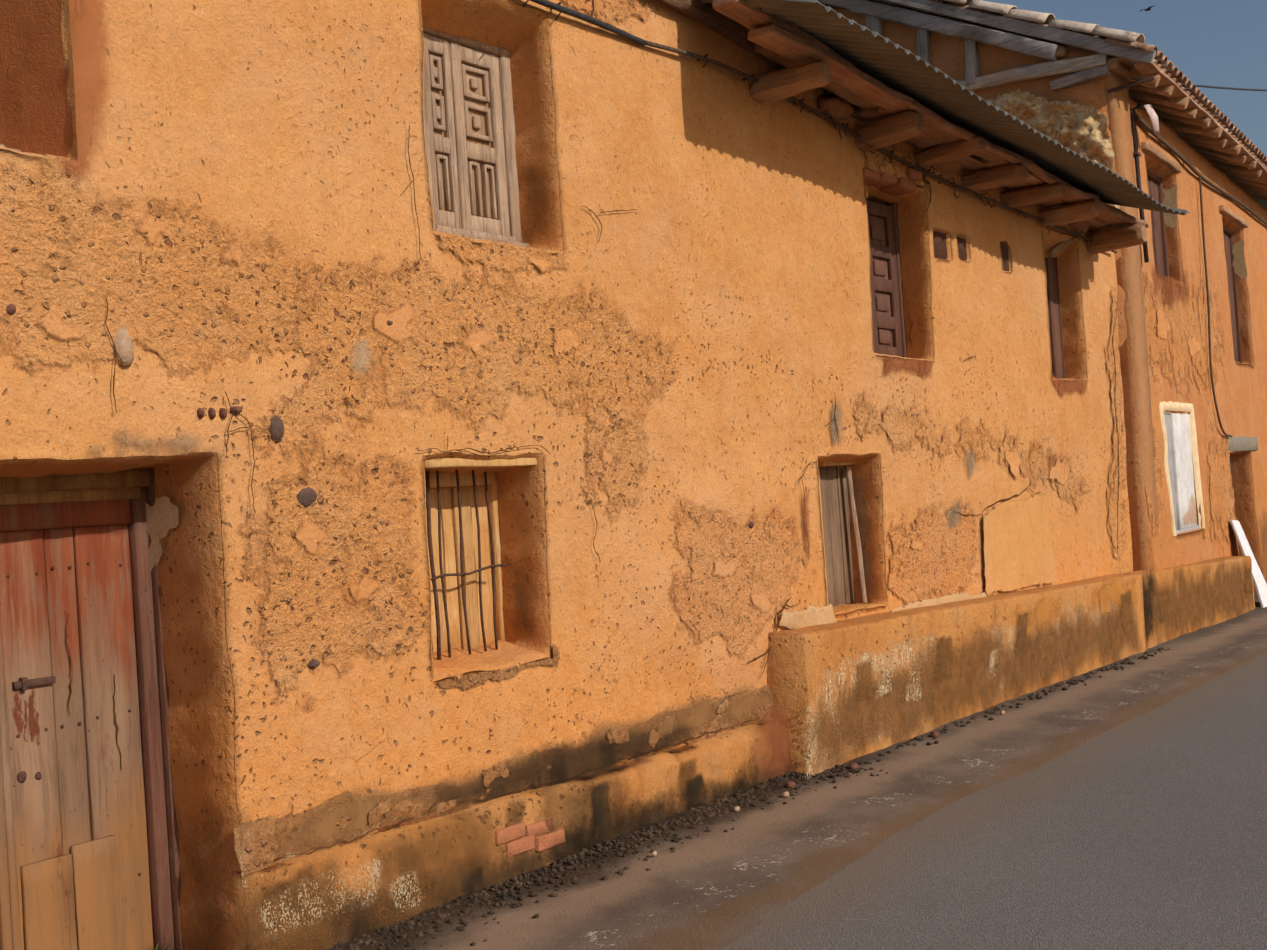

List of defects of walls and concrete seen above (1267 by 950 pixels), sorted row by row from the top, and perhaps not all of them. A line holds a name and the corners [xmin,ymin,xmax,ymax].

flaking render [0,154,679,711]
flaking render [669,498,809,658]
flaking render [854,389,1090,512]
crack [954,484,1038,558]
crack [1111,267,1119,557]
leakage [240,518,1267,950]